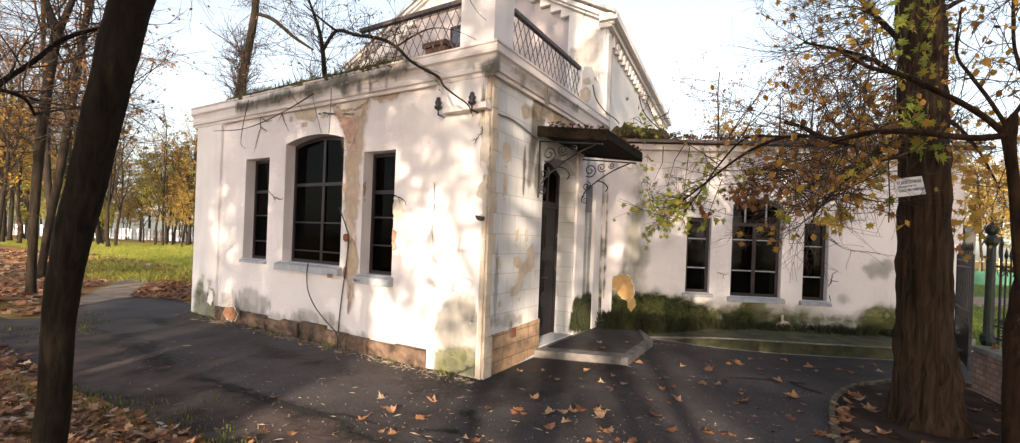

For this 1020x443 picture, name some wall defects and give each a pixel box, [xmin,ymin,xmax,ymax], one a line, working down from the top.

flaking render [496,228,536,309]
flaking render [612,273,636,312]